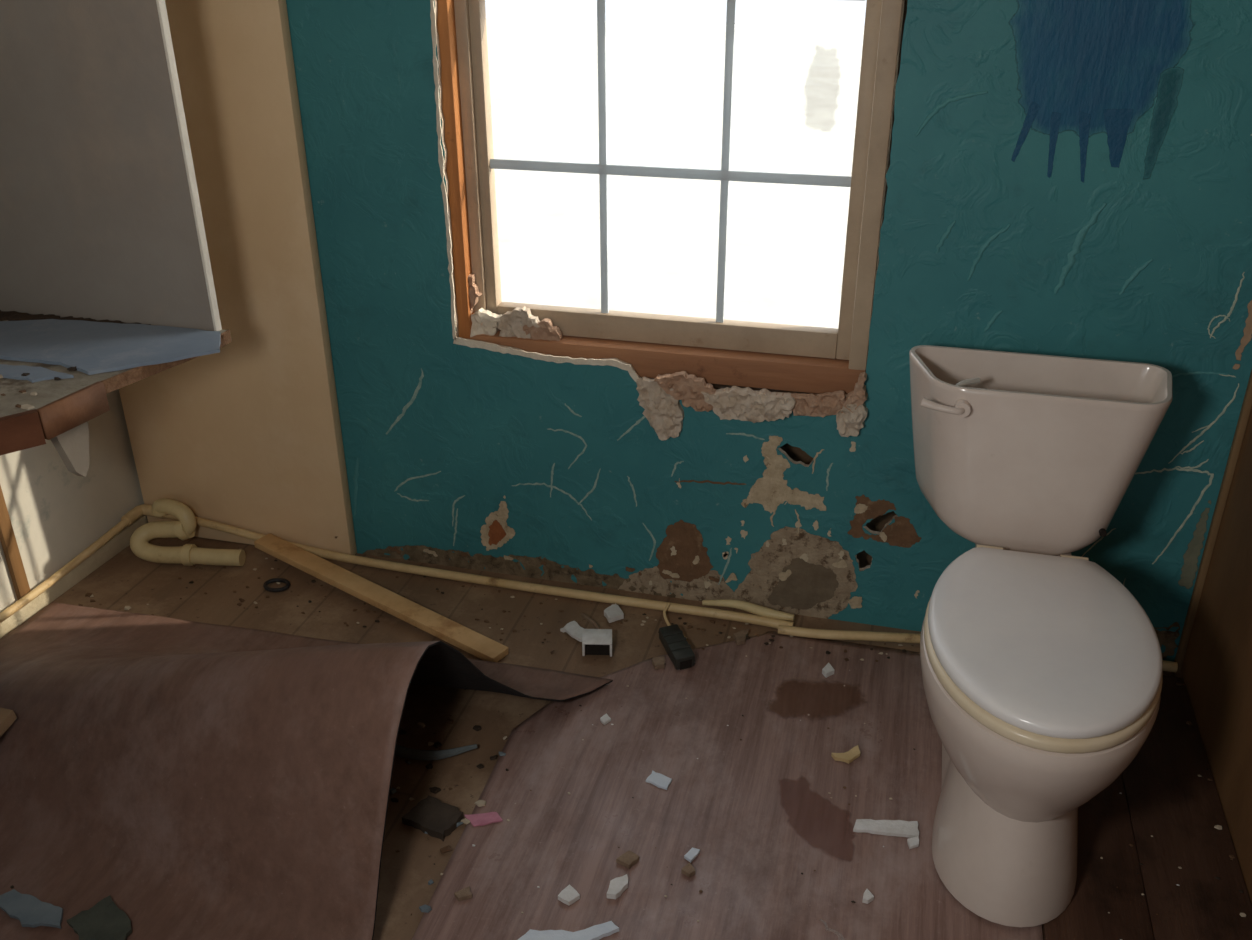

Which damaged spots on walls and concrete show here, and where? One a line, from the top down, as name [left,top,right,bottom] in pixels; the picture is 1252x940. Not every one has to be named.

water stain [1143,67,1184,179]
spalling [430,0,868,441]
peeling [1233,300,1252,370]
peeling [480,495,515,560]
flaking render [616,494,921,619]